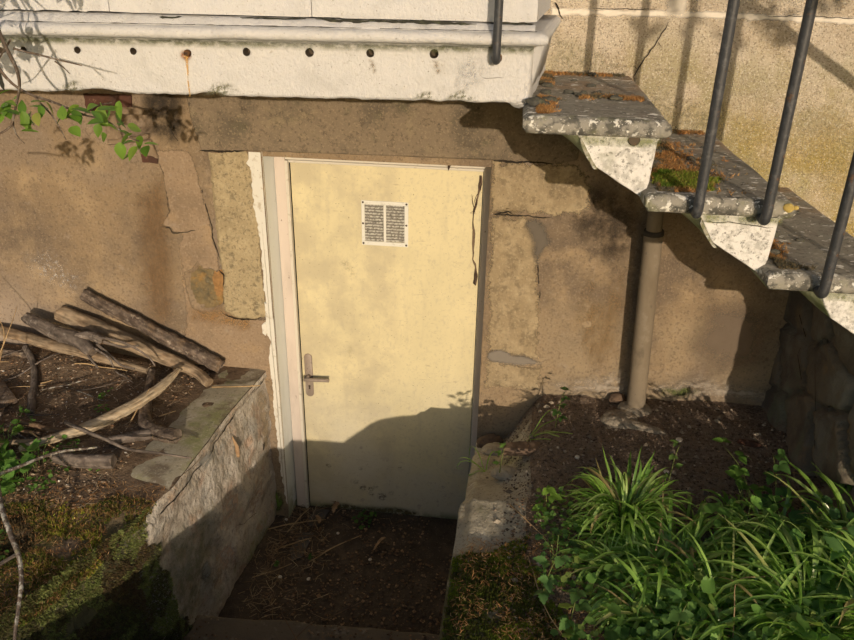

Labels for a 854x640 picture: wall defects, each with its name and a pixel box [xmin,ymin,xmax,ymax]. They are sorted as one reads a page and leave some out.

crack [596,8,668,78]
flaking render [66,81,159,164]
crack [493,158,553,166]
crack [495,210,550,218]
spalling [190,266,225,308]
crack [160,381,263,515]